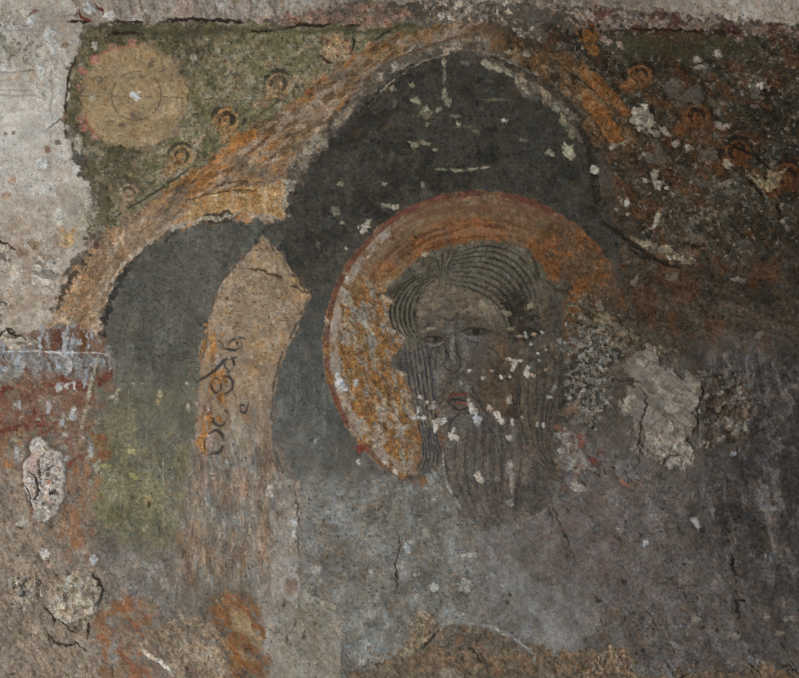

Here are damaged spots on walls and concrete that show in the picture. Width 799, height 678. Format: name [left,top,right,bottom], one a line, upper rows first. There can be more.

flaking render [82,1,117,26]
crack [66,3,362,36]
peeling [692,48,722,71]
peeling [628,102,799,224]
peeling [614,196,632,217]
crack [0,239,17,251]
crack [0,327,28,341]
flaking render [458,288,760,479]
peeling [392,393,460,443]
peeling [473,459,518,507]
spalling [0,434,236,678]
spalling [267,584,608,678]